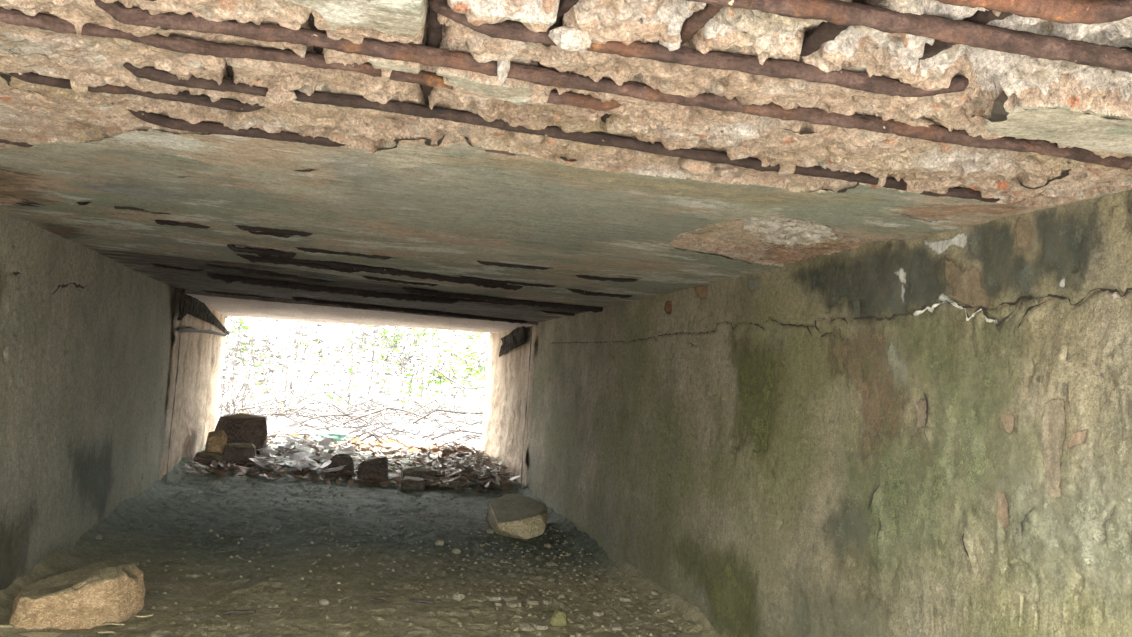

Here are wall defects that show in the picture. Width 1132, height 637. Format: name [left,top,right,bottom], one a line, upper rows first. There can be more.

spalling [0,0,1132,209]
spalling [669,216,899,266]
leakage [760,203,1097,324]
crack [520,282,1132,490]